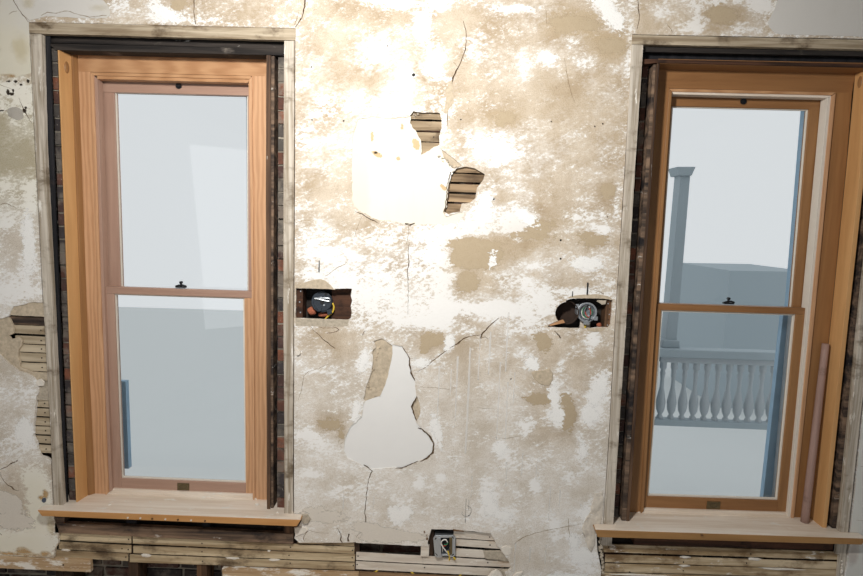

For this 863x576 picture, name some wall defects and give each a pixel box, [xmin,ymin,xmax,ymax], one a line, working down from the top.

crack [452,21,467,82]
spalling [437,150,461,169]
crack [405,223,415,301]
spalling [0,302,49,400]
spalling [364,338,393,401]
spalling [412,398,420,420]
crack [395,320,496,469]
flaking render [294,514,311,537]
crack [303,465,373,542]
flaking render [350,521,429,544]
spalling [483,545,522,576]